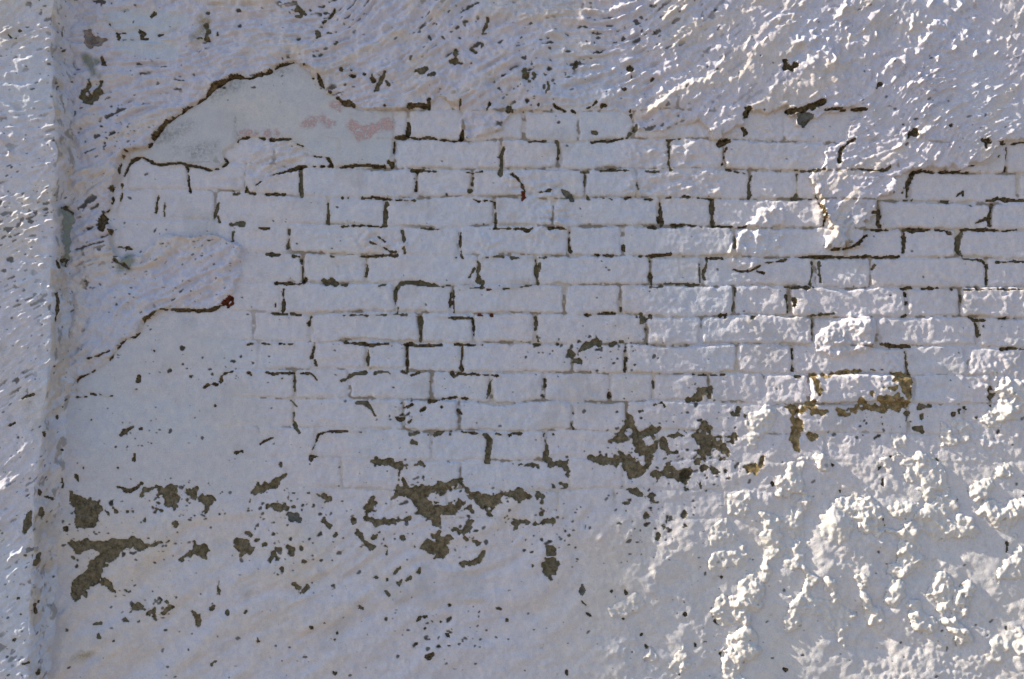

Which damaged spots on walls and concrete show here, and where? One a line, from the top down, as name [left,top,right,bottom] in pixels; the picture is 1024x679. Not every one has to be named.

flaking render [339,67,391,92]
flaking render [407,97,431,110]
peeling [784,369,932,452]
peeling [587,412,738,519]
peeling [22,467,216,622]
peeling [350,456,567,568]
peeling [532,545,560,581]
peeling [655,510,688,541]
peeling [191,585,230,627]